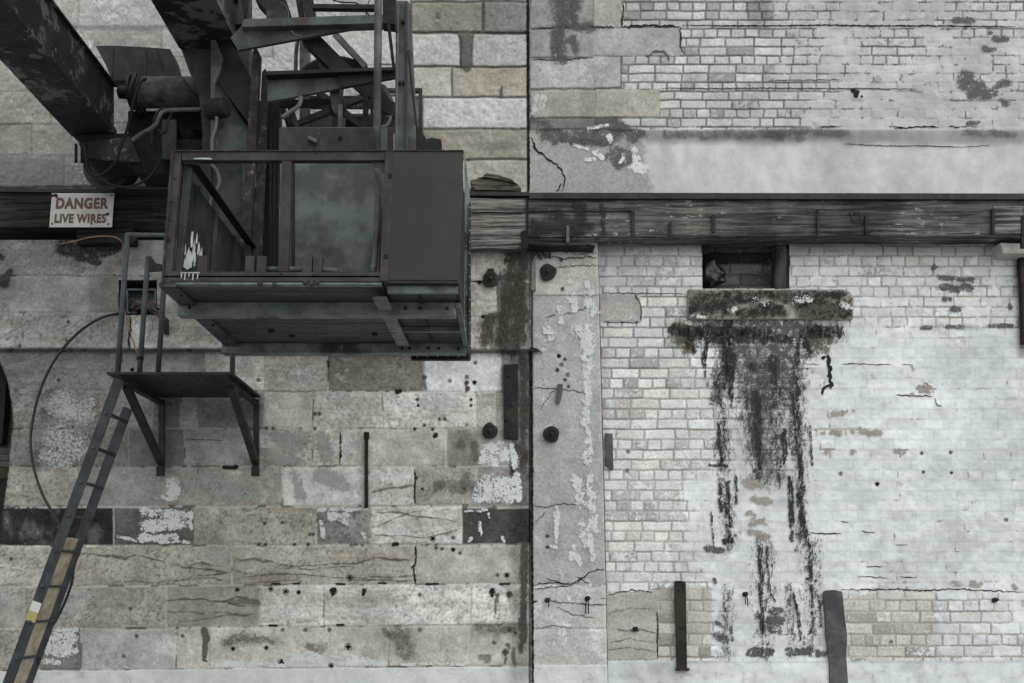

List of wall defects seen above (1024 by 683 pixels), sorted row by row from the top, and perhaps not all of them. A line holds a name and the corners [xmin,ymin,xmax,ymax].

damp [547,0,598,65]
peeling [573,124,613,162]
peeling [618,145,650,175]
crack [471,0,1015,214]
damp [478,251,551,477]
flaking render [117,476,194,544]
flaking render [464,440,522,542]
peeling [542,279,601,567]
crack [529,252,681,683]
damp [667,306,849,664]
damp [476,541,530,653]